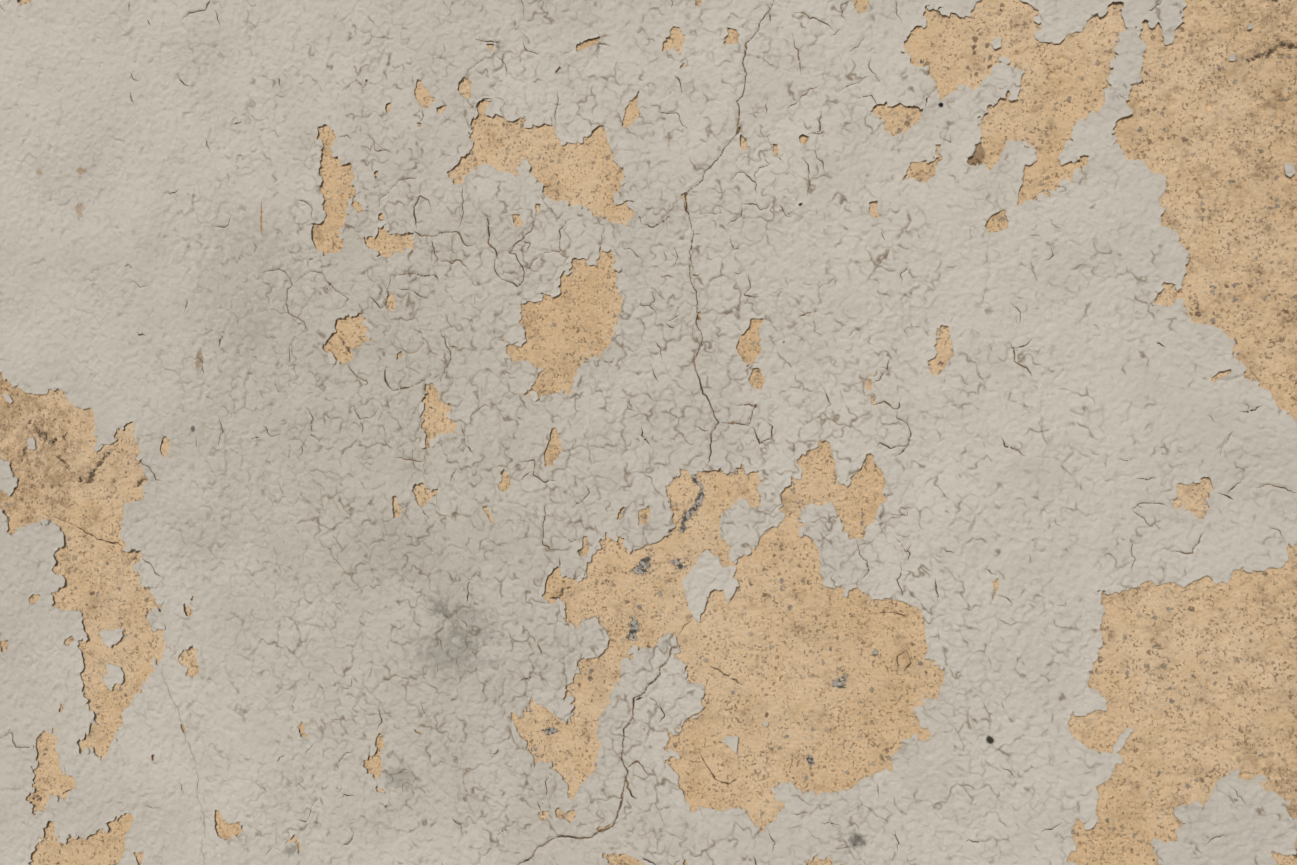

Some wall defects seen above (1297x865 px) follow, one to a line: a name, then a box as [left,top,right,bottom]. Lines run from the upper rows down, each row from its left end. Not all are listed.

crack [181,1,220,24]
crack [343,330,457,436]
crack [254,133,574,366]
peeling [447,77,637,226]
peeling [503,243,623,401]
crack [601,0,880,466]
peeling [899,0,1297,421]
peeling [0,372,199,761]
crack [522,459,598,599]
crack [517,621,691,865]
peeling [511,437,946,833]
peeling [1067,540,1297,865]